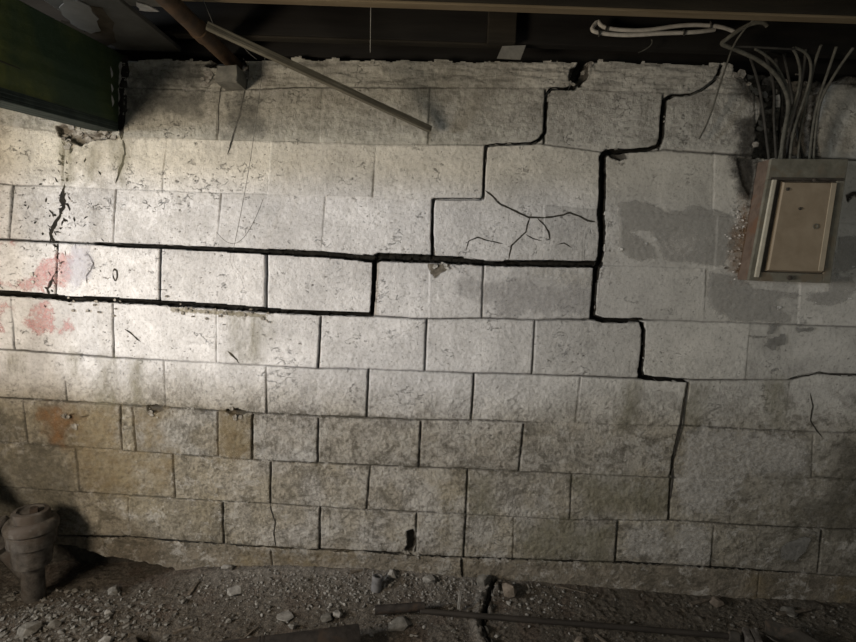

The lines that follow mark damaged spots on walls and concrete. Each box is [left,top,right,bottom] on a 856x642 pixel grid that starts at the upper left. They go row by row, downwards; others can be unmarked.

spalling [55,123,117,150]
crack [0,55,732,519]
crack [76,503,789,642]